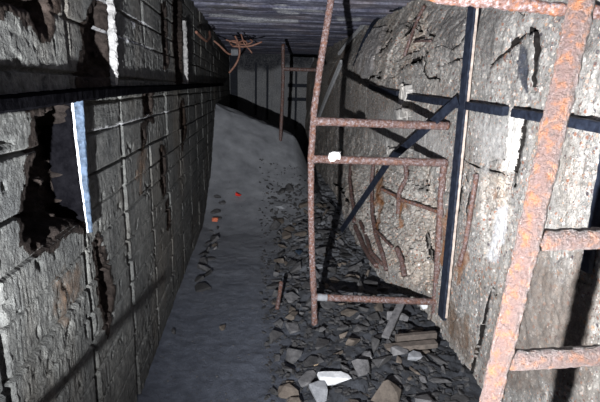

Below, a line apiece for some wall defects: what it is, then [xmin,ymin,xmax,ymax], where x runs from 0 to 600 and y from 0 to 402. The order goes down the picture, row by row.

spalling [0,0,61,45]
crack [365,12,465,86]
crack [490,12,543,88]
spalling [8,104,87,258]
spalling [91,231,116,339]